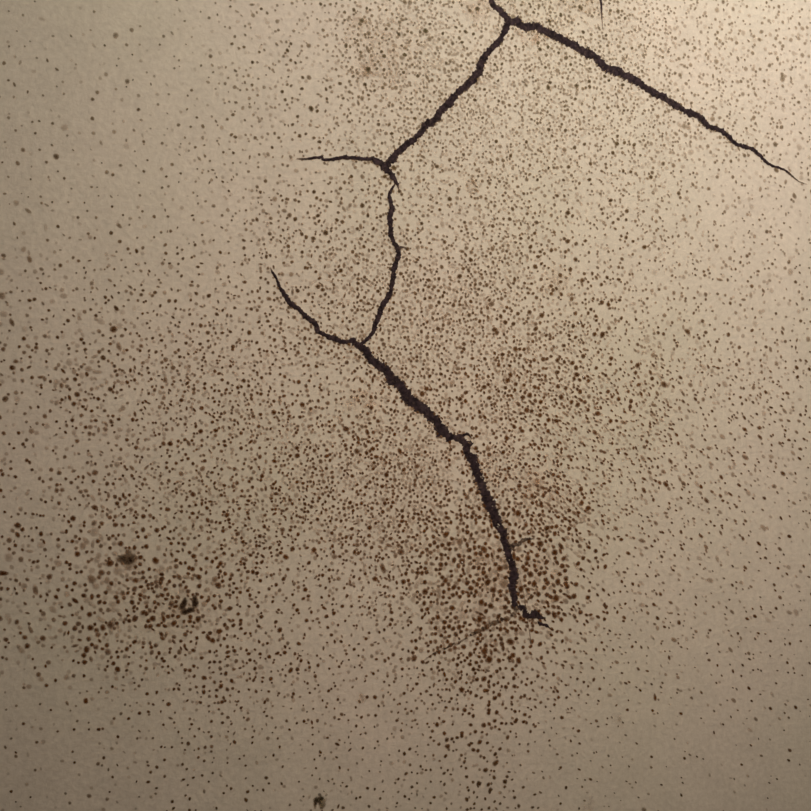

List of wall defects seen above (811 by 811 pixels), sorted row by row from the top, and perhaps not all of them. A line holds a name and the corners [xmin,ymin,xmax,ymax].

crack [268,0,808,661]